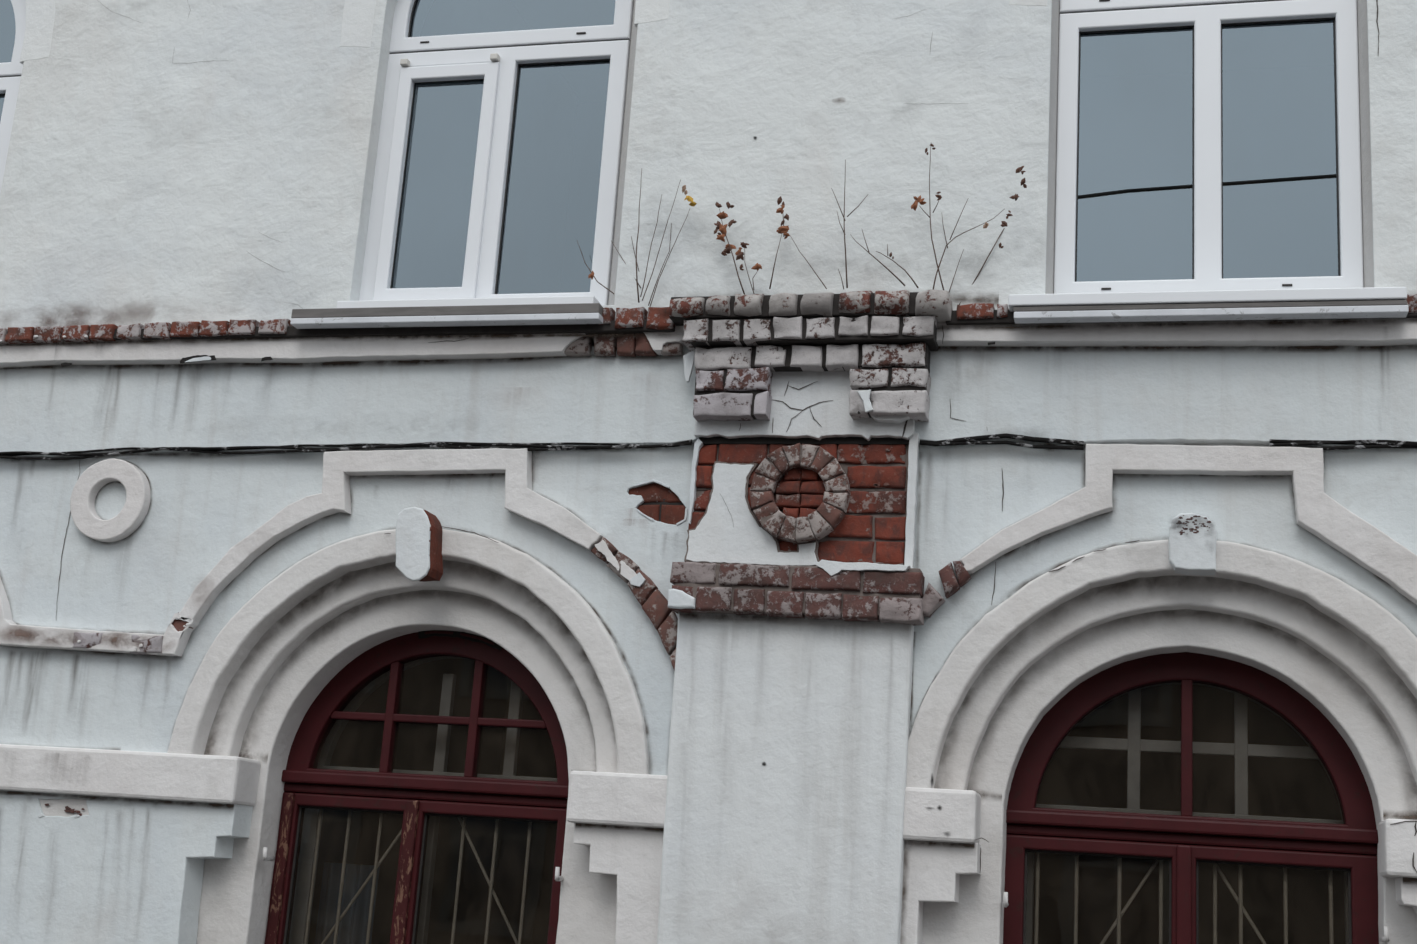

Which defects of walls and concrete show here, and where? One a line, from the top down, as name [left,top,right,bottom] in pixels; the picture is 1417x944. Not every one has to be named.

spalling [180,355,216,364]
crack [739,381,833,433]
flaking render [628,444,907,566]
flaking render [591,537,678,671]
flaking render [922,561,971,618]